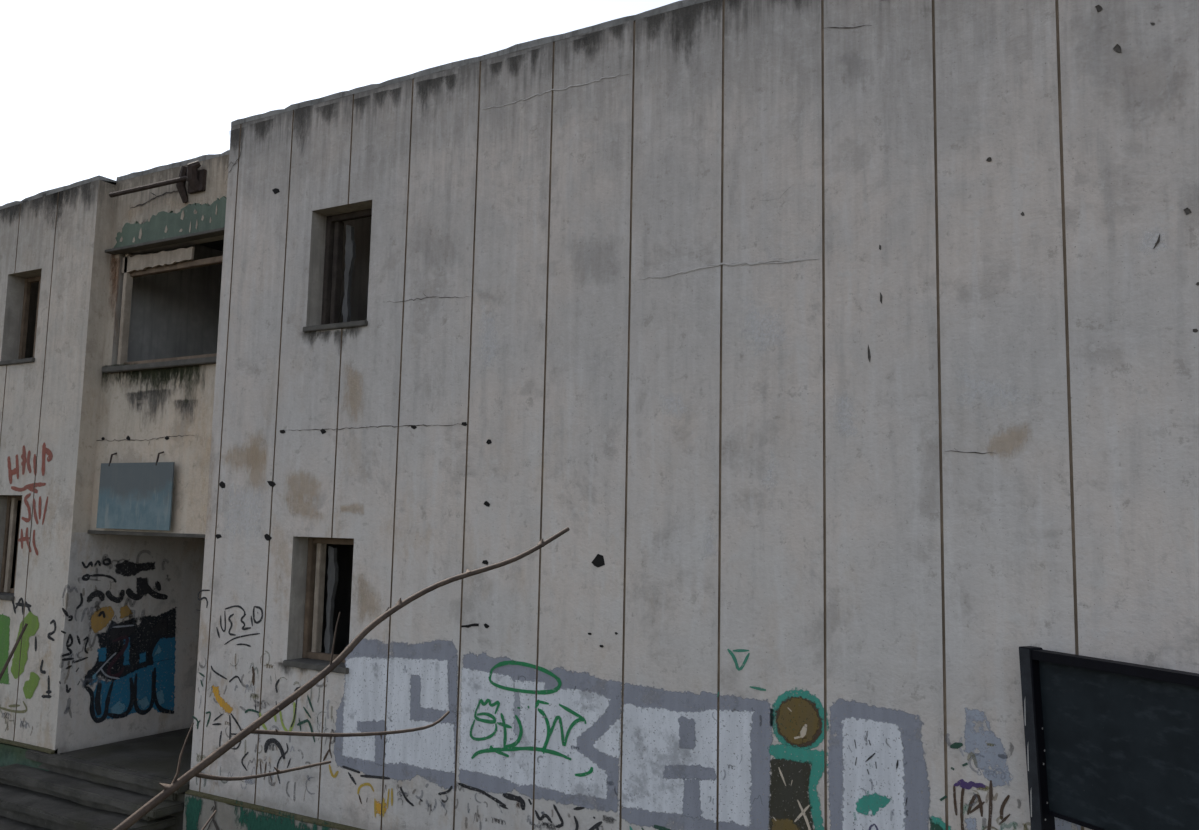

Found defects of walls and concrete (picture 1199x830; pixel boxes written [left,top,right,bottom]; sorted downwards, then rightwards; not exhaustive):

water stain [574,24,622,52]
water stain [647,0,739,44]
water stain [102,364,200,413]
peeling [185,796,202,830]
peeling [234,800,339,830]